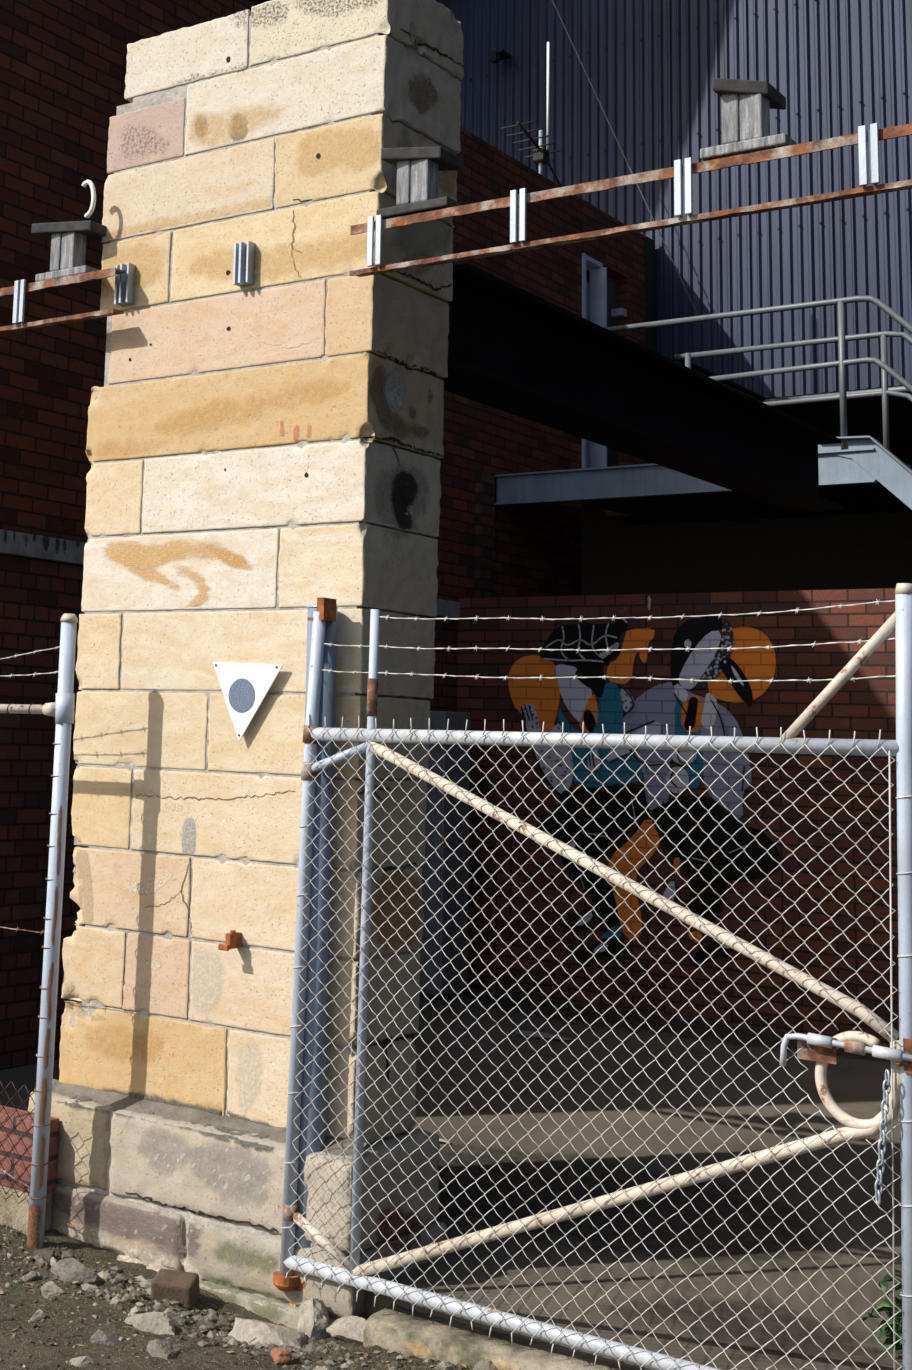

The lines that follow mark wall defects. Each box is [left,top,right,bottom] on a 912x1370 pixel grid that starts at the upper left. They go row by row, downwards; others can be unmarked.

crack [400,28,464,67]
crack [135,790,296,801]
crack [144,866,192,934]
damp [141,1134,269,1202]